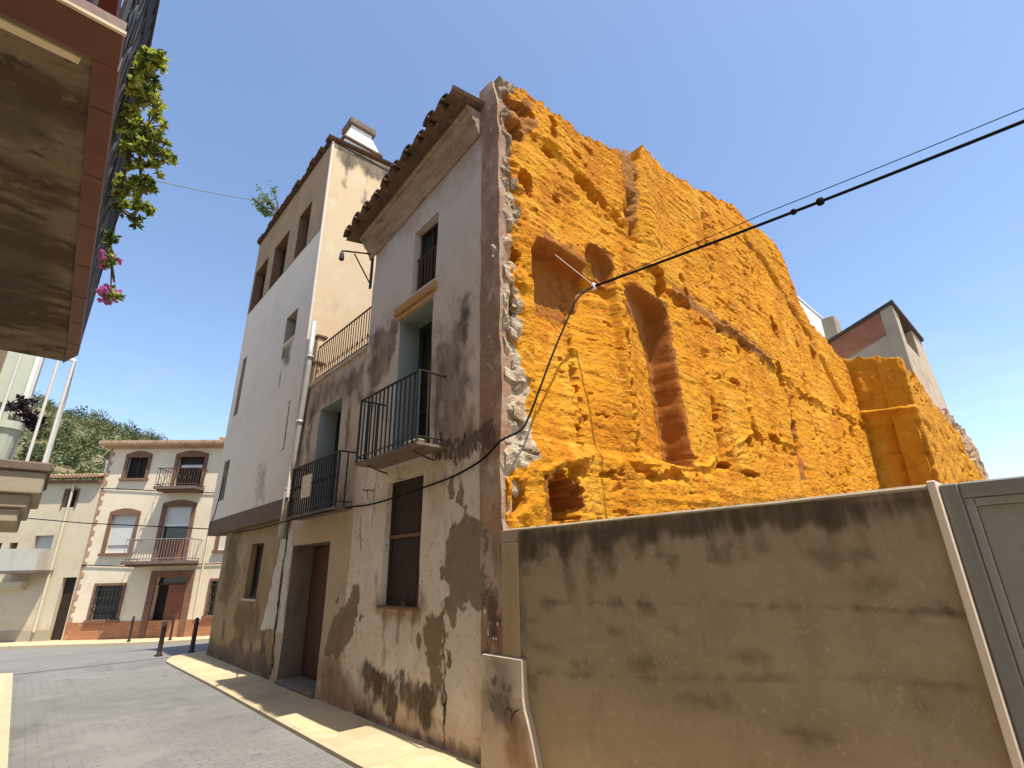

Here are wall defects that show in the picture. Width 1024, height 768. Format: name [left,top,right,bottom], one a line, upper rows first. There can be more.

peeling [405,418,503,689]
water stain [520,501,865,559]
peeling [324,584,363,660]
water stain [355,660,445,749]
crack [437,636,450,742]